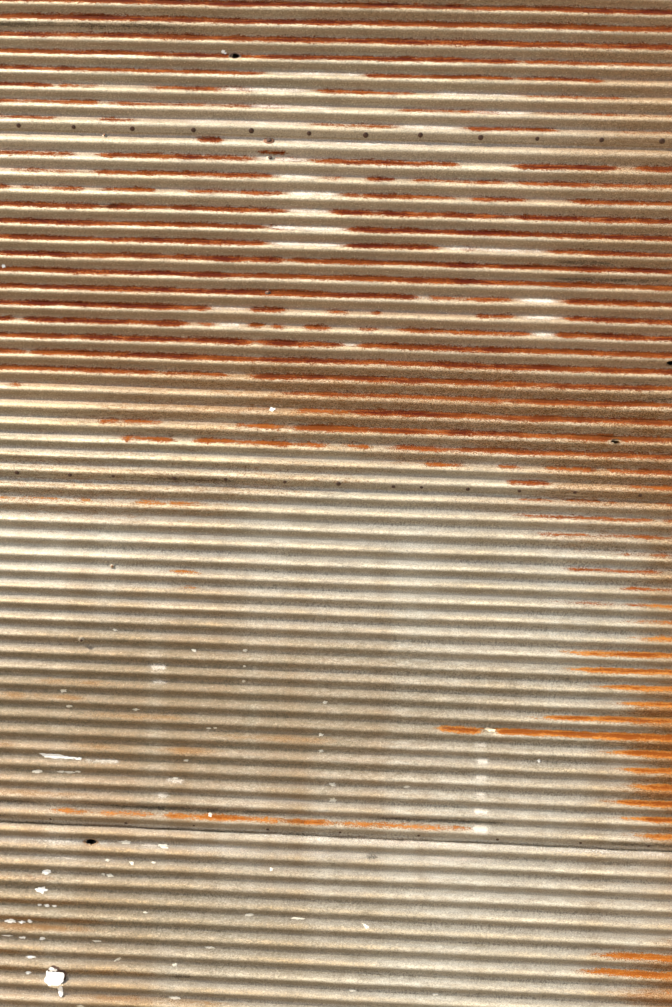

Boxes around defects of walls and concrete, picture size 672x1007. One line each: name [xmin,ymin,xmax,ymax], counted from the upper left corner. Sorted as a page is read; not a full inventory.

rust [0,0,672,122]
rust [310,121,399,129]
rust [398,108,557,132]
rust [0,135,672,558]
rust [435,567,672,846]
rust [49,807,473,832]
rust [571,940,672,1007]